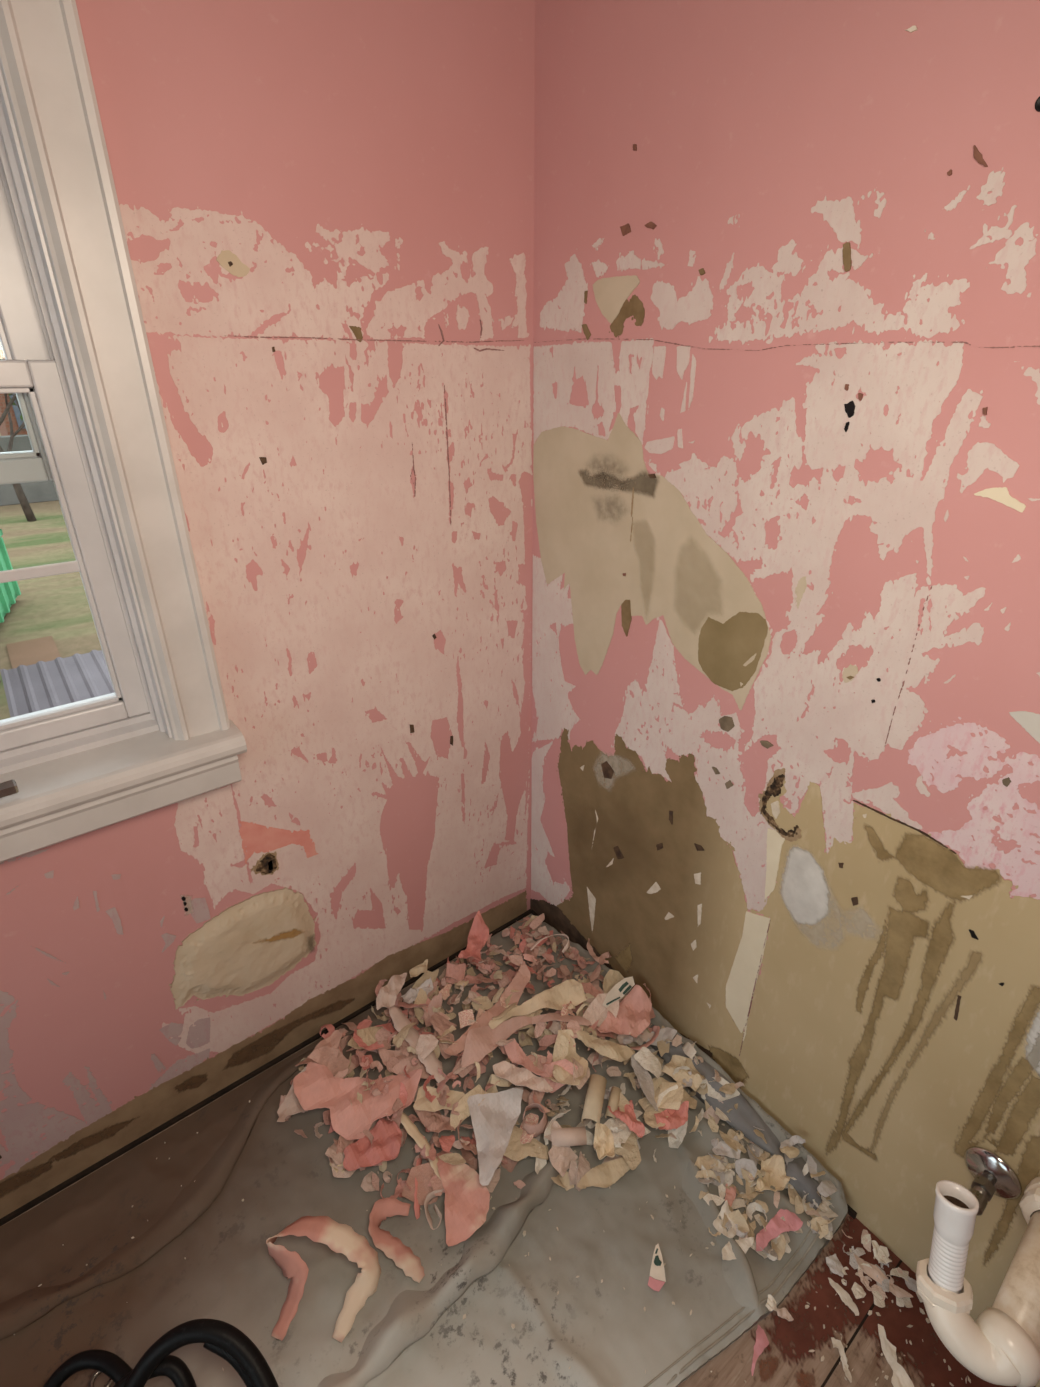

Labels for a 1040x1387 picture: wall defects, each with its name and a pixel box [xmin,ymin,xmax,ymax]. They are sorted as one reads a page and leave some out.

crack [225,320,1040,352]
peeling [944,145,1039,297]
peeling [119,187,1040,1090]
peeling [0,990,112,1179]
leakage [826,826,999,1160]
leakage [955,986,1040,1265]